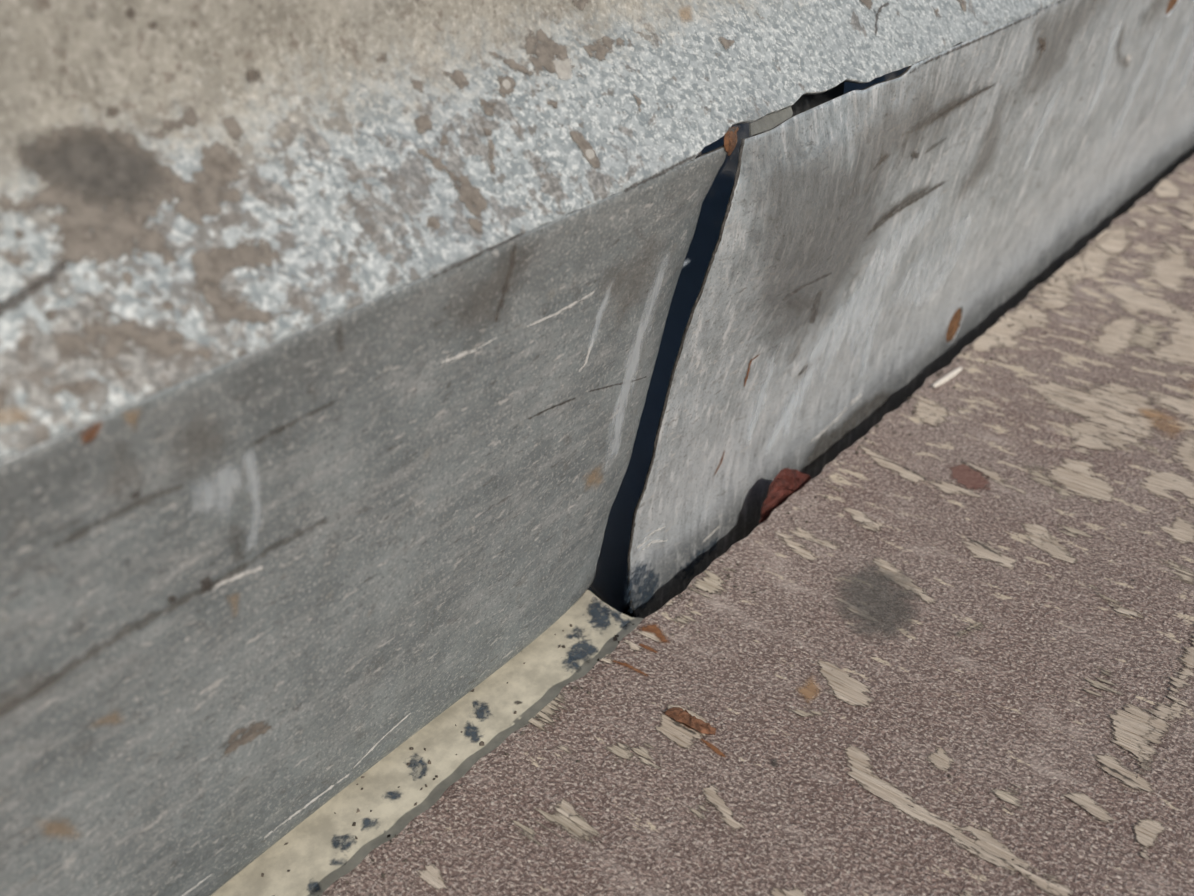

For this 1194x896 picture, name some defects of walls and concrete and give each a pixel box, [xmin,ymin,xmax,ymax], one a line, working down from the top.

crack [910,0,1063,73]
rust [724,127,739,156]
crack [433,233,523,277]
peeling [970,171,1194,367]
rust [946,308,962,342]
crack [625,147,743,618]
peeling [861,379,1194,508]
peeling [818,656,872,707]
peeling [656,704,726,757]
peeling [1083,666,1192,793]
peeling [845,745,1074,896]
peeling [1133,818,1169,860]